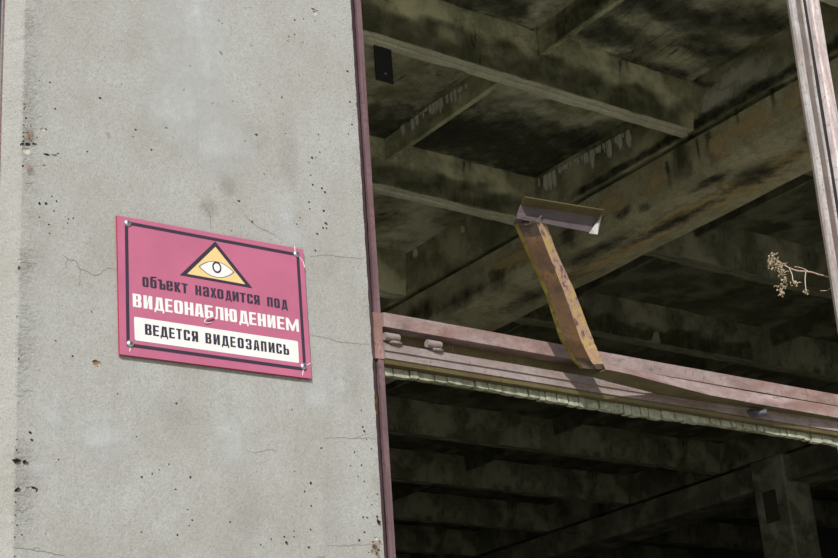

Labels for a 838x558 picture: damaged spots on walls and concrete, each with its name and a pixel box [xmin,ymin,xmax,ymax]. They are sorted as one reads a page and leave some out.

damp [615,0,788,60]
damp [361,0,687,125]
damp [368,83,632,191]
damp [576,135,687,196]
damp [693,64,797,153]
damp [699,161,791,188]
damp [652,209,702,233]
damp [412,301,431,318]
damp [522,289,554,322]
damp [582,309,753,360]